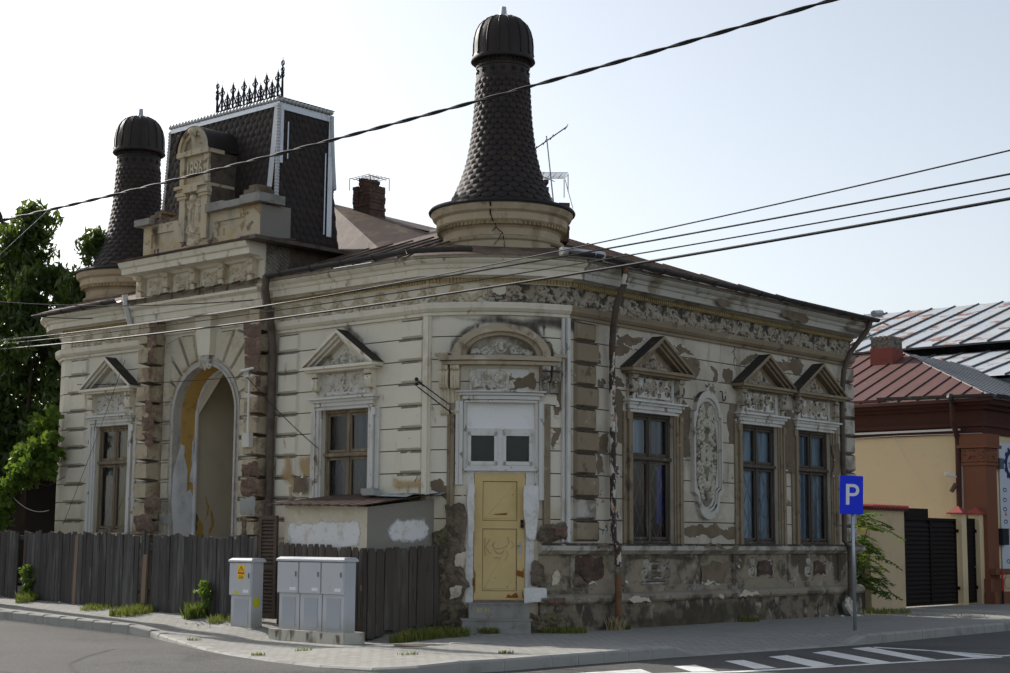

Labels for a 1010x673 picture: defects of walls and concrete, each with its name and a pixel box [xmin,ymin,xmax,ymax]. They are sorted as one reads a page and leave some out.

flaking render [615,334,646,358]
flaking render [674,344,760,391]
damp [283,458,310,499]
damp [393,478,421,494]
flaking render [537,522,568,543]
flaking render [430,479,470,631]
flaking render [530,560,561,587]
damp [631,603,758,626]